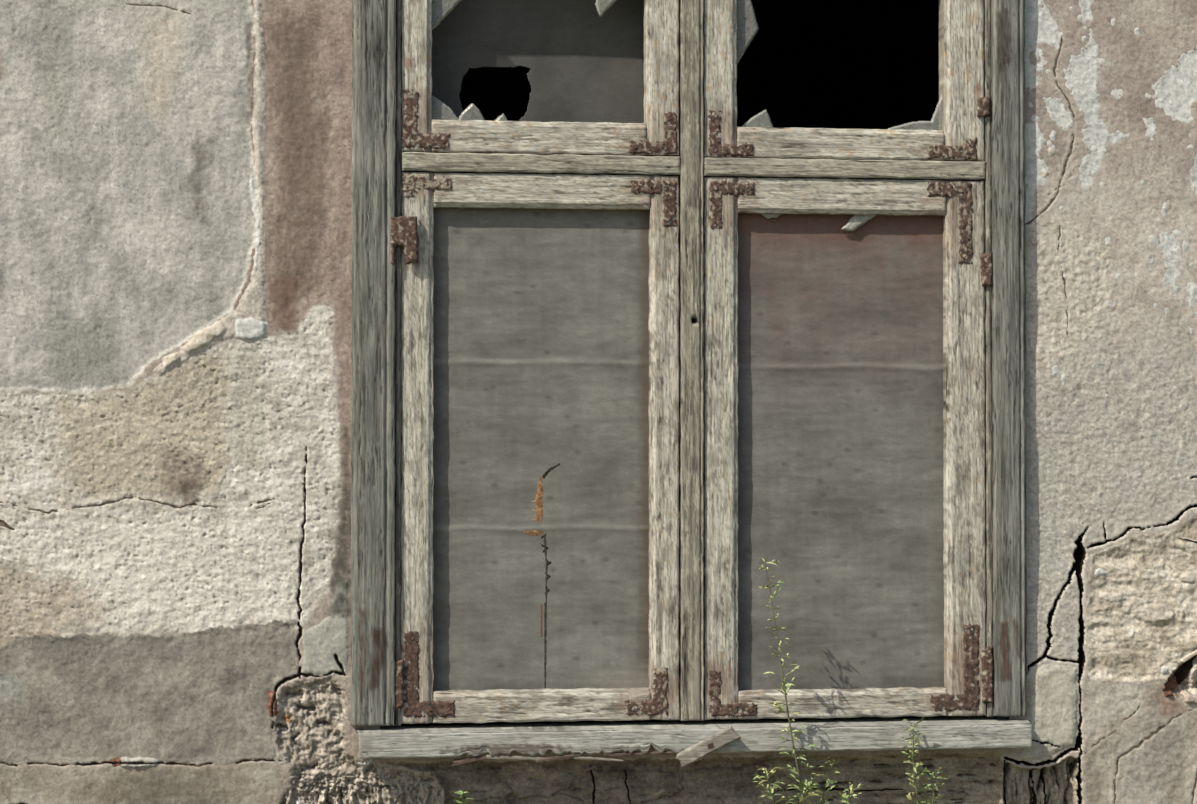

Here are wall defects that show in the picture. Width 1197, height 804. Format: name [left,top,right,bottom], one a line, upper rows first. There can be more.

peeling [0,0,268,394]
crack [1025,37,1075,336]
peeling [1024,0,1130,385]
peeling [1142,46,1197,141]
peeling [1148,202,1197,334]
peeling [1187,144,1197,195]
crack [0,496,217,530]
crack [0,759,281,767]
crack [249,498,274,509]
crack [271,446,346,729]
spalling [266,516,1197,804]
crack [1004,476,1197,804]